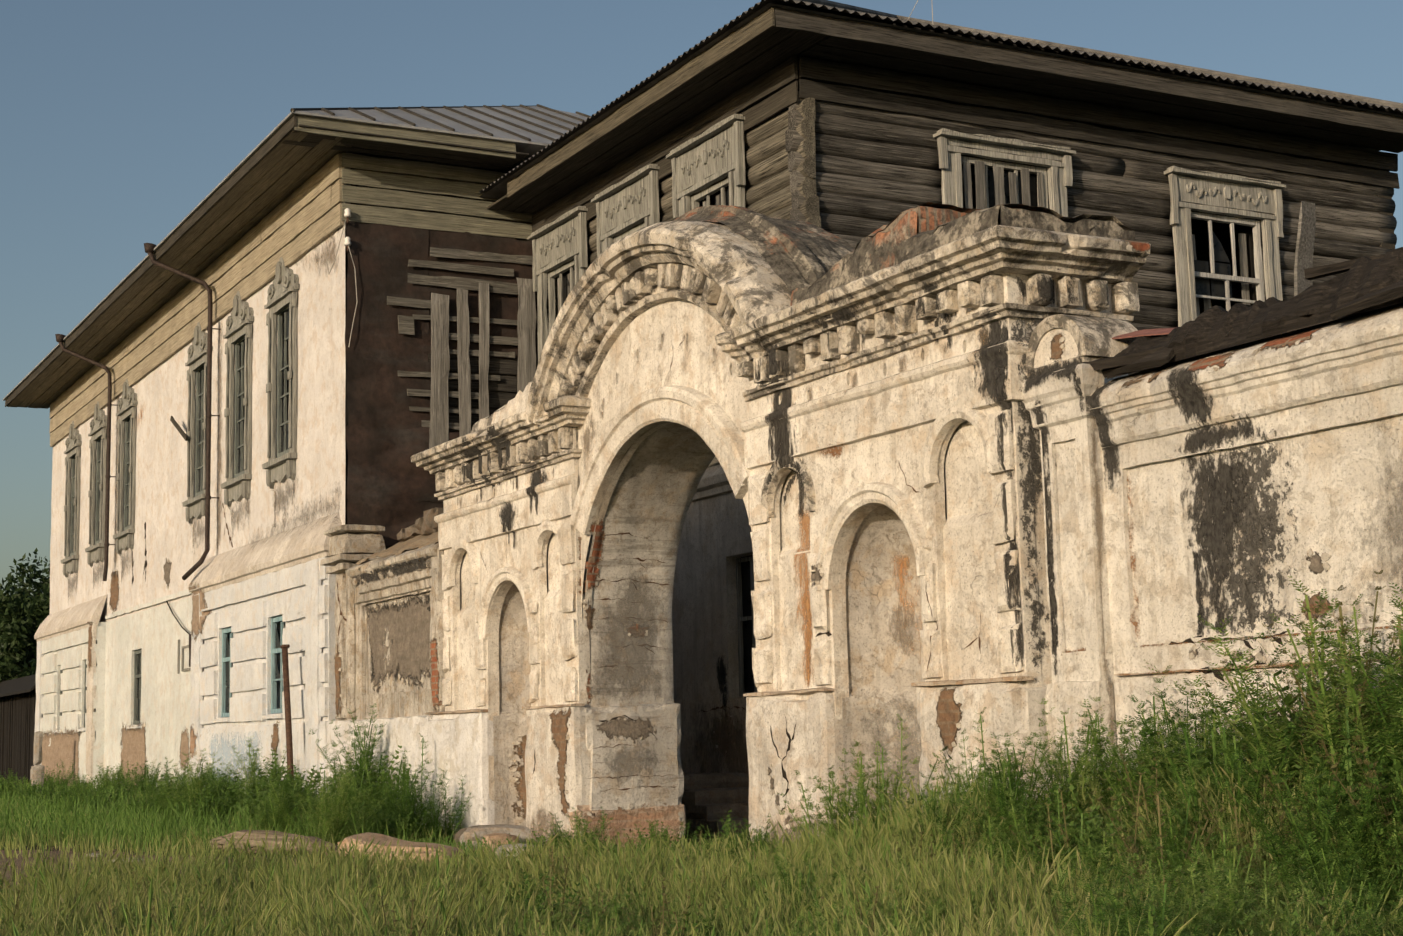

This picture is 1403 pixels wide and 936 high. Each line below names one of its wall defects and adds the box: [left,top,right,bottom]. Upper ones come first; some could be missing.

water stain [749,325,806,518]
water stain [967,268,1129,681]
water stain [1166,367,1300,646]
spalling [577,519,607,636]
water stain [371,627,408,681]
water stain [1100,584,1114,756]
flaking render [41,726,82,786]
flaking render [120,722,147,790]
flaking render [180,726,201,774]
spalling [549,669,593,836]
crack [699,706,796,811]